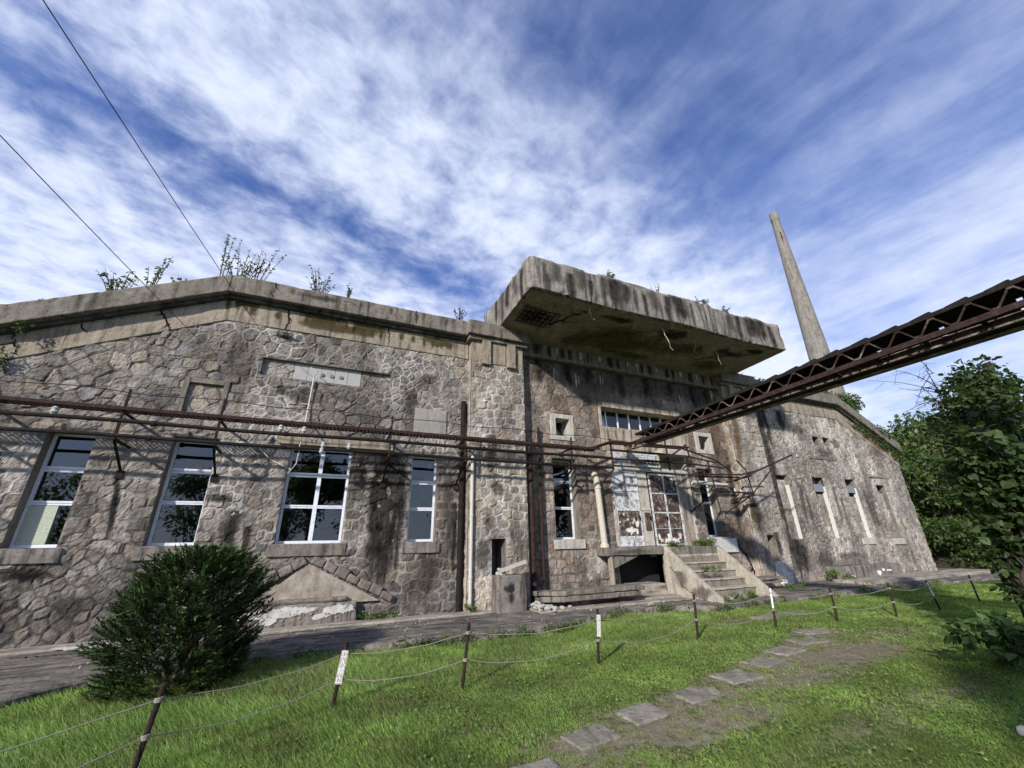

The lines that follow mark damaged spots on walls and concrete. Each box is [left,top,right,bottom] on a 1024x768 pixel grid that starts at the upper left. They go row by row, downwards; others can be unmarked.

crack [155,310,172,330]
damp [495,268,523,320]
damp [543,263,696,340]
damp [367,451,405,581]
peeling [237,603,355,626]